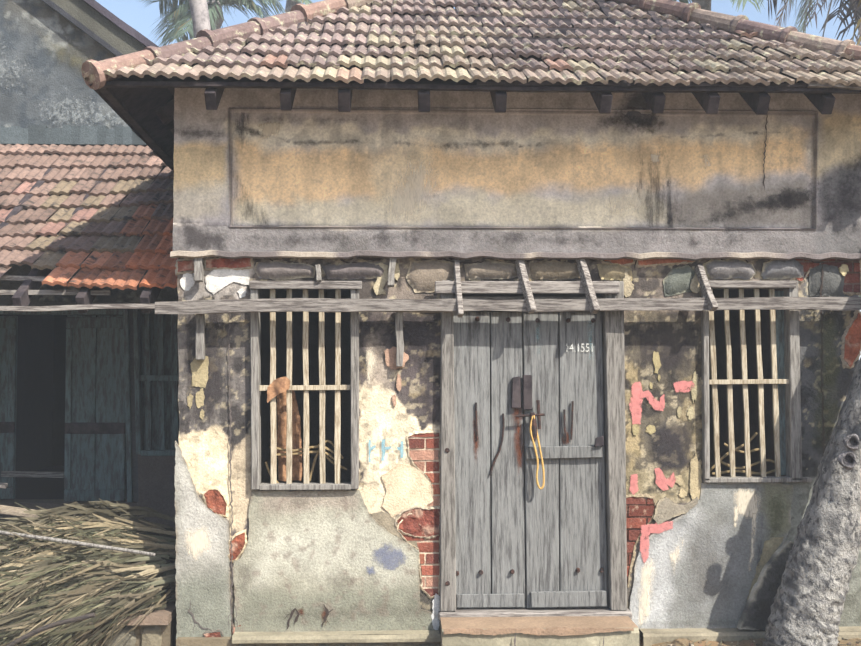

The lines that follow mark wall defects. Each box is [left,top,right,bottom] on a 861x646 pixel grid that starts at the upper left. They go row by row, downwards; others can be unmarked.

water stain [604,93,656,132]
crack [762,107,770,189]
water stain [646,181,673,227]
water stain [726,191,810,217]
flaking render [175,257,254,298]
spalling [384,347,409,406]
flaking render [649,351,661,389]
flaking render [677,372,700,420]
flaking render [201,486,230,518]
flaking render [228,529,248,564]
flaking render [360,430,440,630]
flaking render [626,452,702,588]